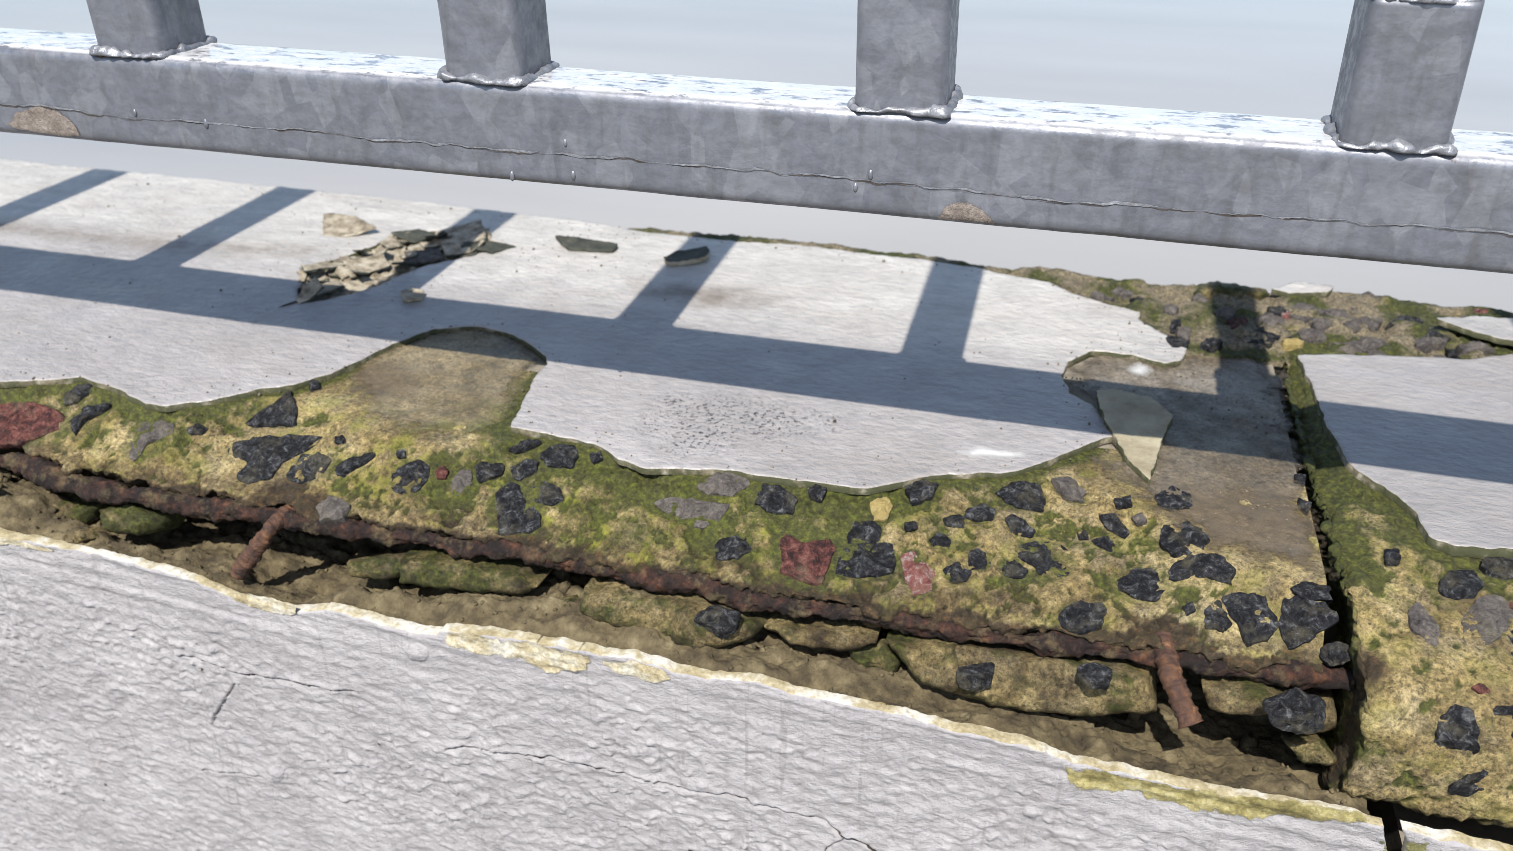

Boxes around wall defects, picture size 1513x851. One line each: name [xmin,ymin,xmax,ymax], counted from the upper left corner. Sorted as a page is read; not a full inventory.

corrosion [7,106,79,137]
peeling [296,213,515,304]
corrosion [939,202,993,225]
spalling [0,227,1513,828]